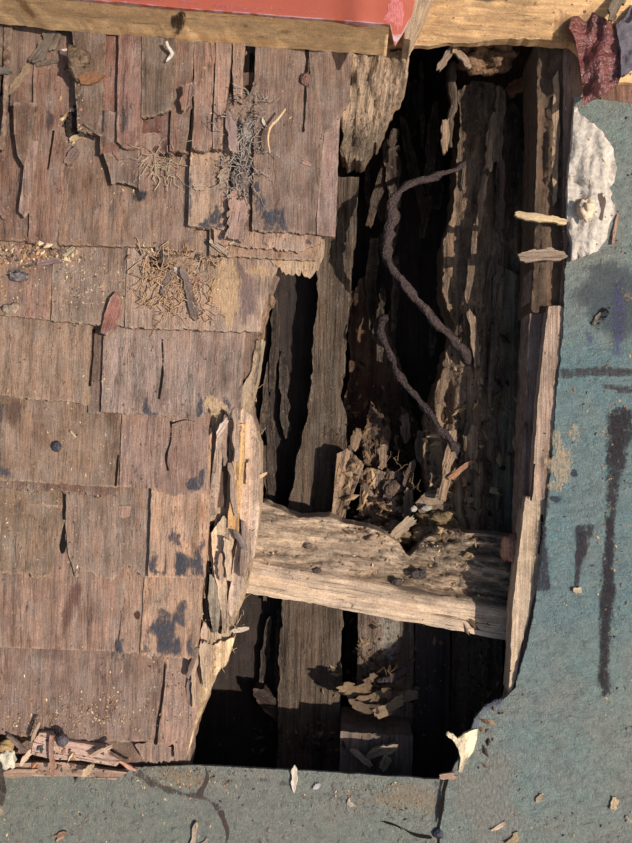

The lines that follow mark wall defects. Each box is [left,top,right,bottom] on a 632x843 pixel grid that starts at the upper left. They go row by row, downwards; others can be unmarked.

crack [157,339,165,399]
crack [165,419,195,471]
crack [59,493,67,554]
peeling [389,487,452,539]
water stain [143,600,193,656]
water stain [600,517,620,688]
peeling [446,728,478,772]
crack [136,767,229,843]
crack [382,781,448,839]